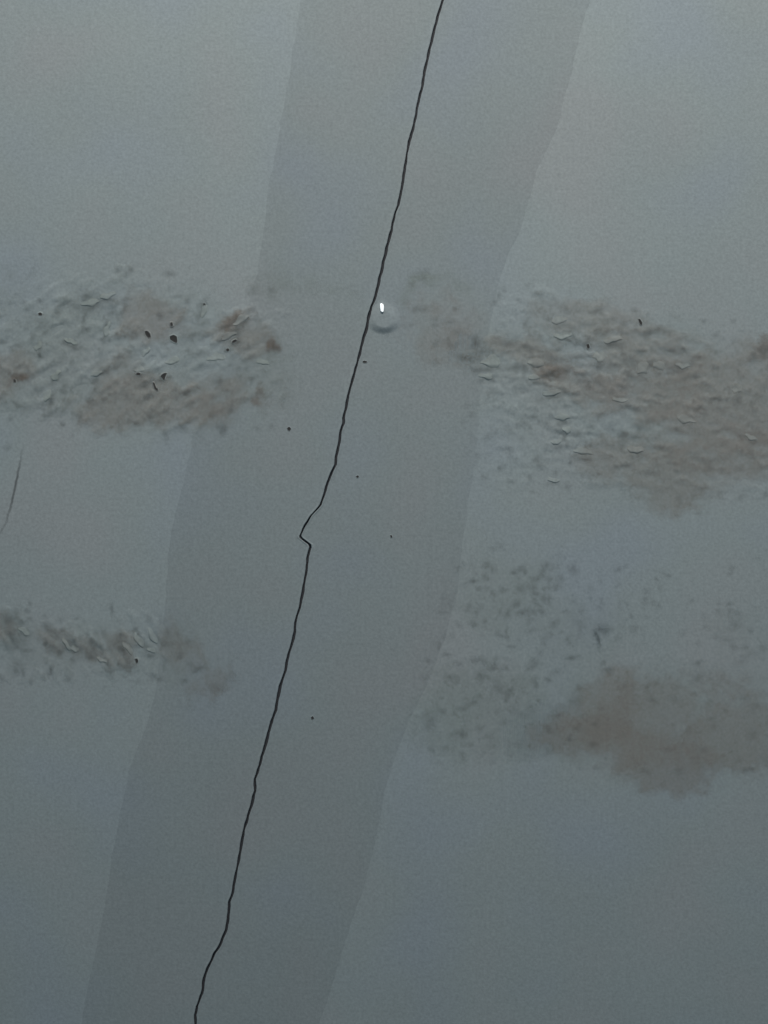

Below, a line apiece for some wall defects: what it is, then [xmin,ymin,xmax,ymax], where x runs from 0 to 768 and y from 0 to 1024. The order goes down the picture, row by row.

crack [191,0,446,1024]